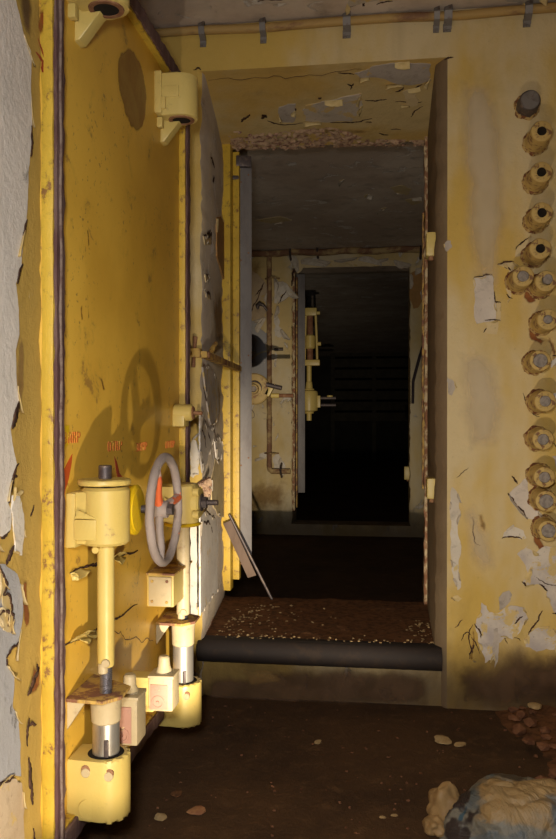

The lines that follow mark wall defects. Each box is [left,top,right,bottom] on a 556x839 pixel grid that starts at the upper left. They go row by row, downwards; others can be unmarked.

crack [194,67,423,135]
spalling [228,93,425,152]
peeling [355,61,431,108]
peeling [0,0,36,556]
peeling [252,271,299,378]
peeling [473,274,513,335]
peeling [190,365,225,616]
peeling [449,487,462,601]
peeling [472,525,556,666]
peeling [508,476,542,520]
peeling [0,564,29,839]